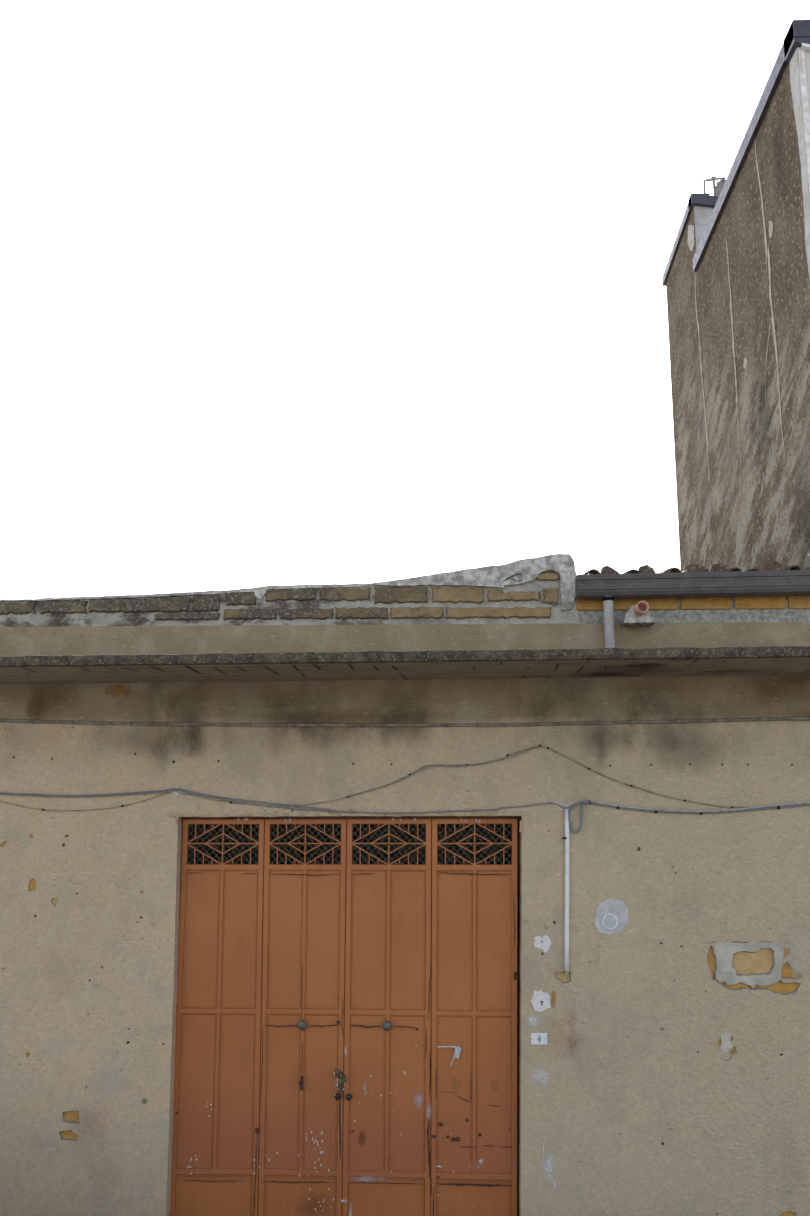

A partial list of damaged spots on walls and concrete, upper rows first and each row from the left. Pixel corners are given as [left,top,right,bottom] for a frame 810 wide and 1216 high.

spalling [705,945,802,995]